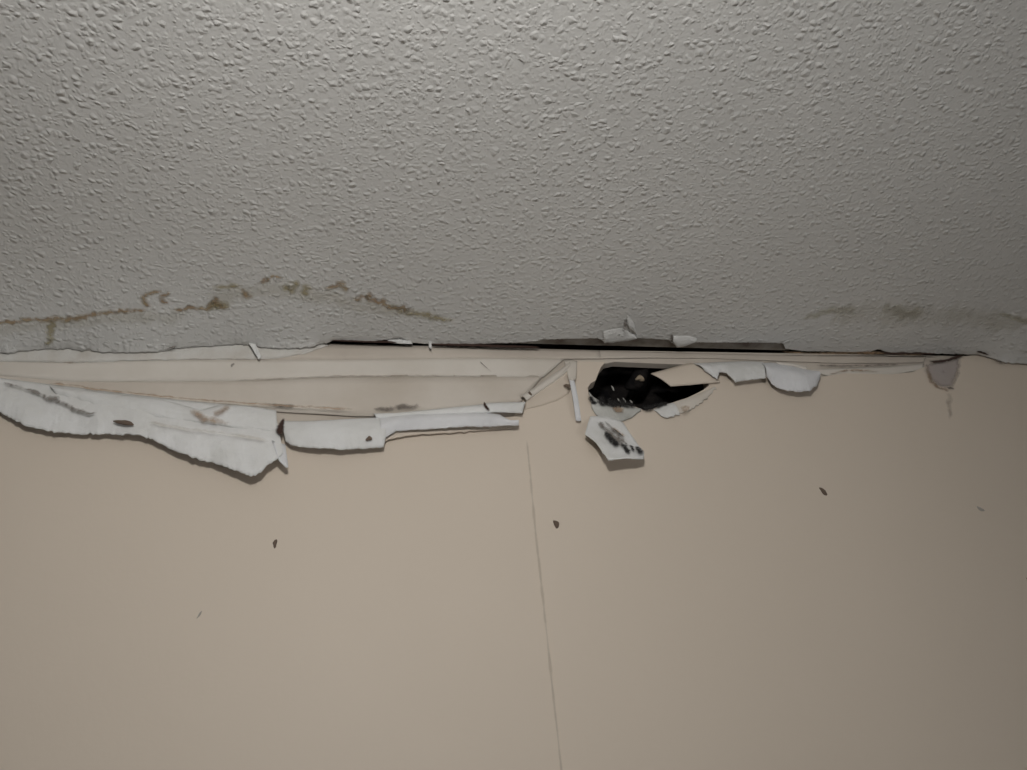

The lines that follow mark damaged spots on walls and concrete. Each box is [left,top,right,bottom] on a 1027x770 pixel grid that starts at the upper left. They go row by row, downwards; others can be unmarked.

damp [0,285,249,344]
damp [356,294,445,321]
crack [331,315,1002,363]
peeling [0,340,970,477]